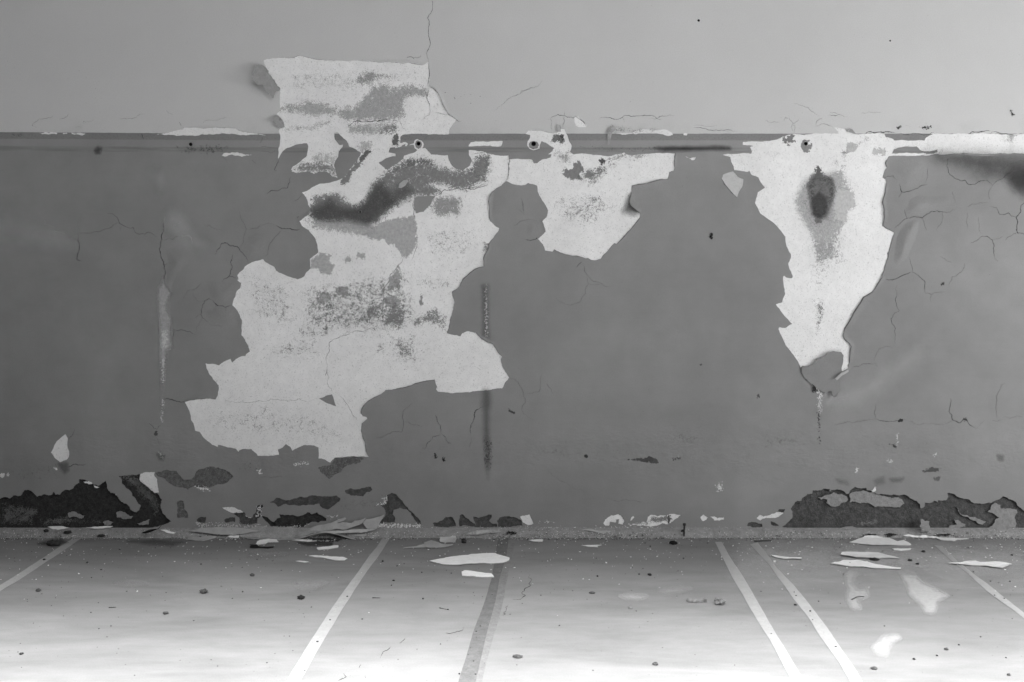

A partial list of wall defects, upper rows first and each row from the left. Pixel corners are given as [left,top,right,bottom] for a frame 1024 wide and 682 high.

crack [348,1,452,129]
damp [806,166,839,225]
crack [885,159,1024,253]
peeling [163,51,695,479]
peeling [722,128,1024,397]
damp [158,278,172,383]
spalling [0,466,233,534]
spalling [222,487,372,545]
spalling [747,487,1024,569]